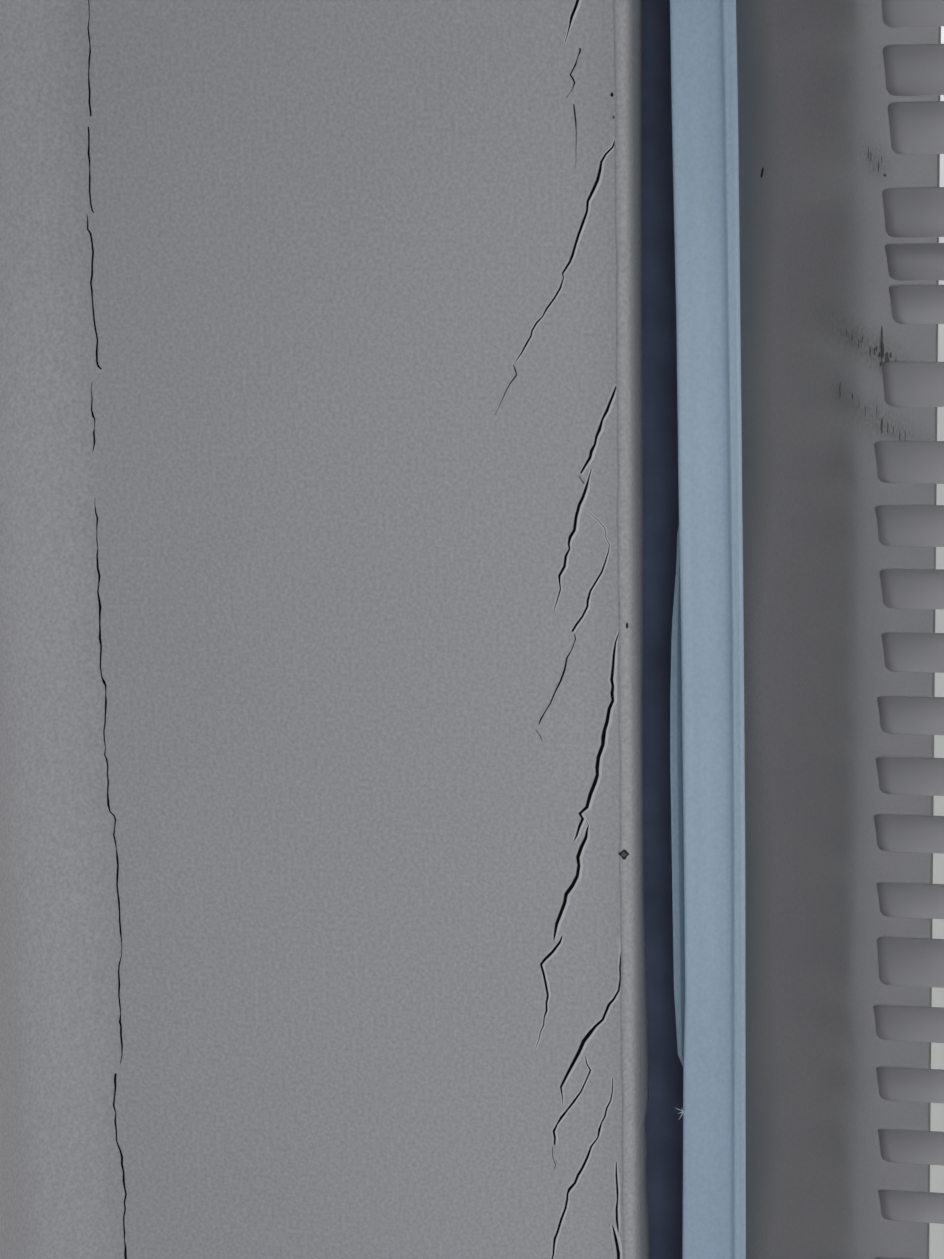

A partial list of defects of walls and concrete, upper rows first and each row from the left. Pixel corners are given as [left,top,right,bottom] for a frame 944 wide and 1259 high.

crack [87,0,102,450]
crack [499,0,615,406]
crack [536,384,616,742]
crack [95,507,127,1259]
crack [534,631,619,1051]
crack [550,941,622,1259]